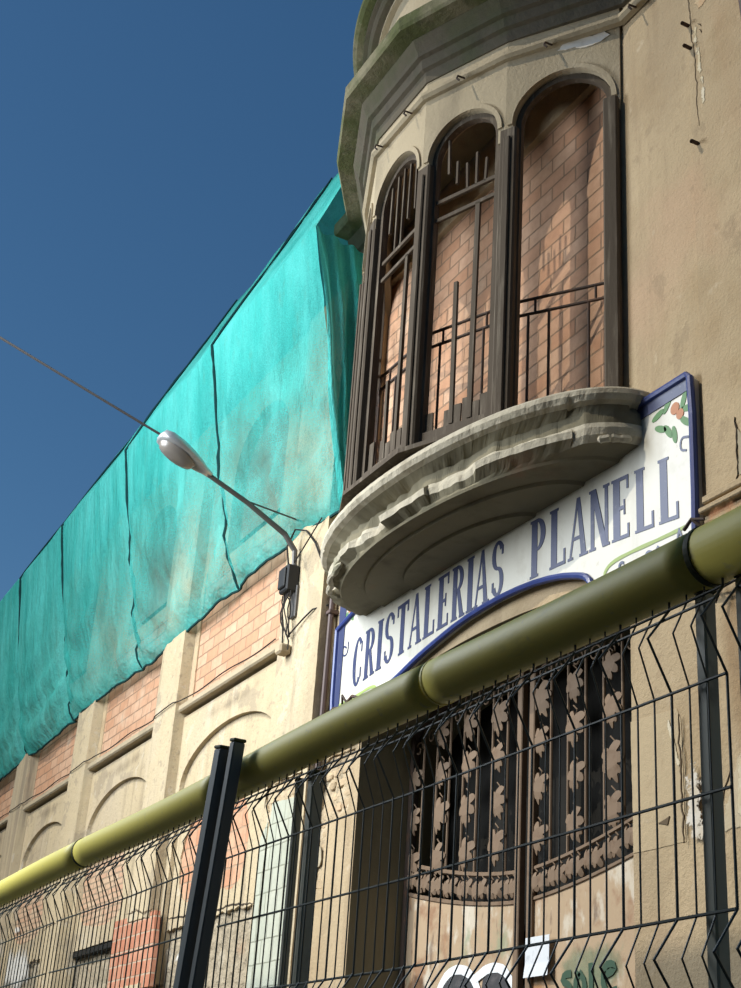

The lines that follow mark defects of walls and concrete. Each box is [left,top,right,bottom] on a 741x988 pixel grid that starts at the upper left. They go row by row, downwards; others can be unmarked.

flaking render [321,751,354,852]
peeling [723,753,741,832]
water stain [5,951,29,988]